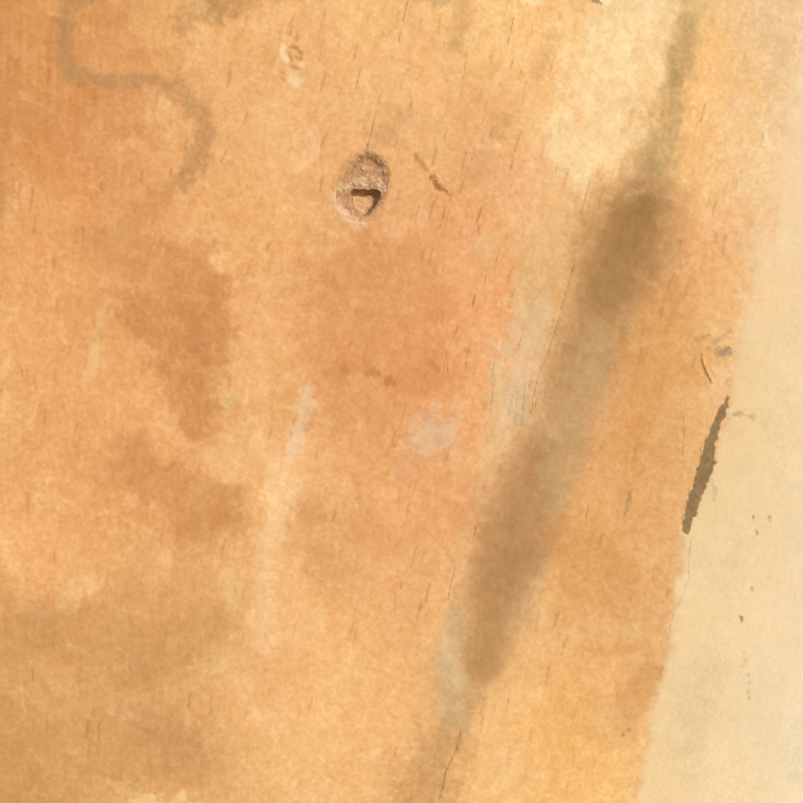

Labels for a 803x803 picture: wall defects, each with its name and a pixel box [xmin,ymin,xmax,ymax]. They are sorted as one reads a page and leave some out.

spalling [327,149,393,234]
water stain [270,0,738,803]